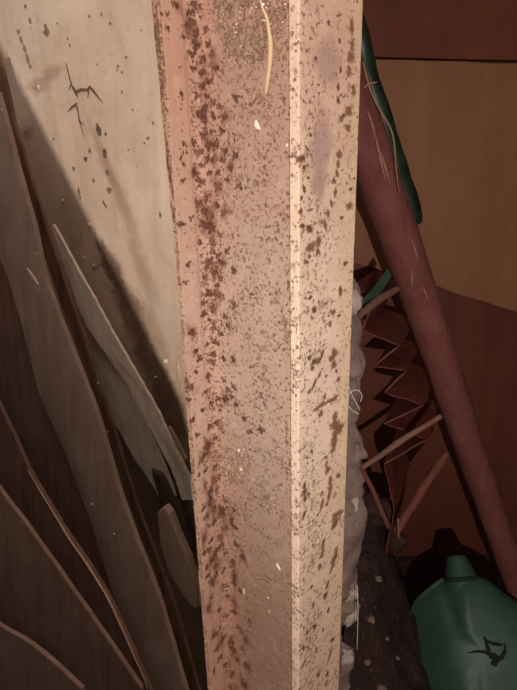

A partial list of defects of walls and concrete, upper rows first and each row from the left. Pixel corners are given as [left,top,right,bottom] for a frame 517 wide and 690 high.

rust [340,19,354,75]
crack [65,62,103,138]
rust [337,83,352,131]
rust [296,149,310,214]
rust [324,152,342,229]
rust [300,224,321,264]
rust [160,1,265,689]
rust [307,349,340,394]
rust [320,413,344,509]